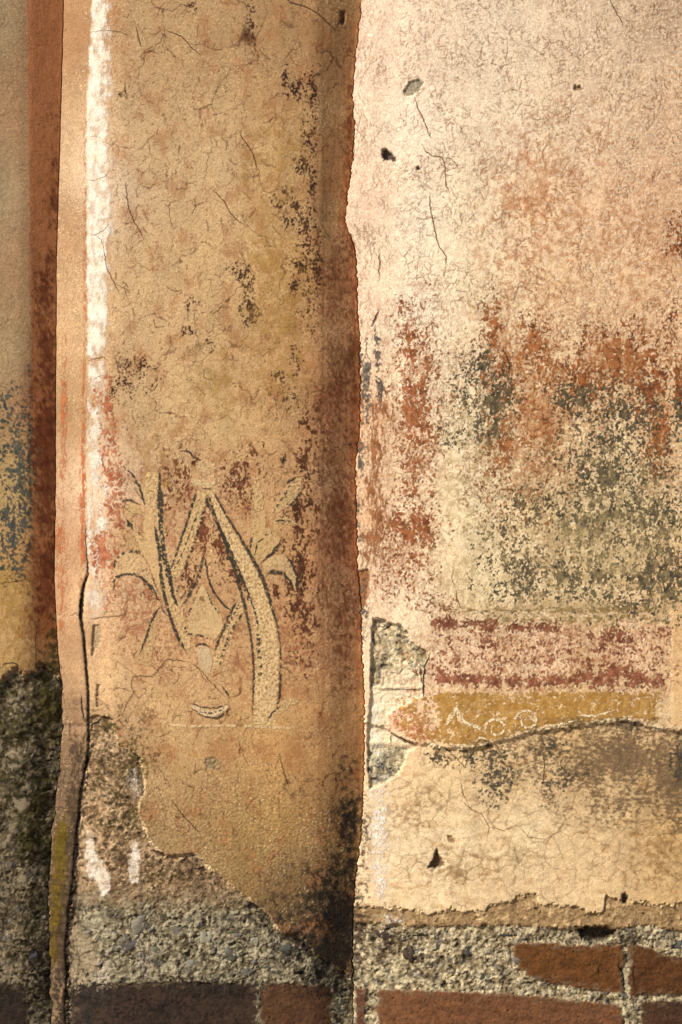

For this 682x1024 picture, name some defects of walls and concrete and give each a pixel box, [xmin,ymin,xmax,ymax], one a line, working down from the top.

crack [89,25,198,53]
crack [90,171,144,293]
leakage [359,330,384,424]
leakage [437,344,529,453]
leakage [467,370,682,629]
crack [386,654,429,695]
spalling [367,611,681,789]
spalling [0,661,64,1024]
spalling [66,684,682,1024]
crack [390,736,564,840]